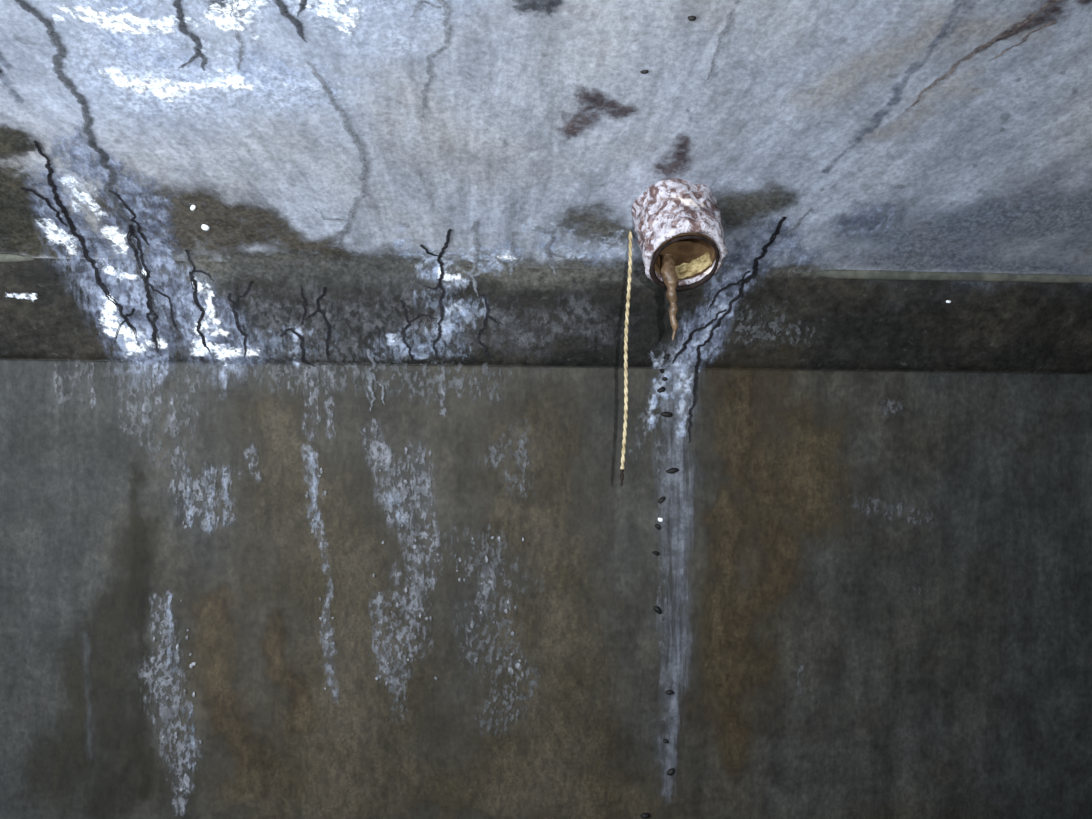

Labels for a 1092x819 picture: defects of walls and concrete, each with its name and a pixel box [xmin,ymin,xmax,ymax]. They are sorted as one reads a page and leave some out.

damp [513,0,562,13]
rust [978,0,1062,51]
damp [0,56,23,101]
crack [275,0,368,245]
rust [562,90,634,137]
damp [852,62,924,146]
crack [15,0,253,357]
damp [835,189,1092,276]
crack [280,285,331,367]
crack [400,221,500,363]
crack [672,209,811,443]
damp [0,126,822,819]